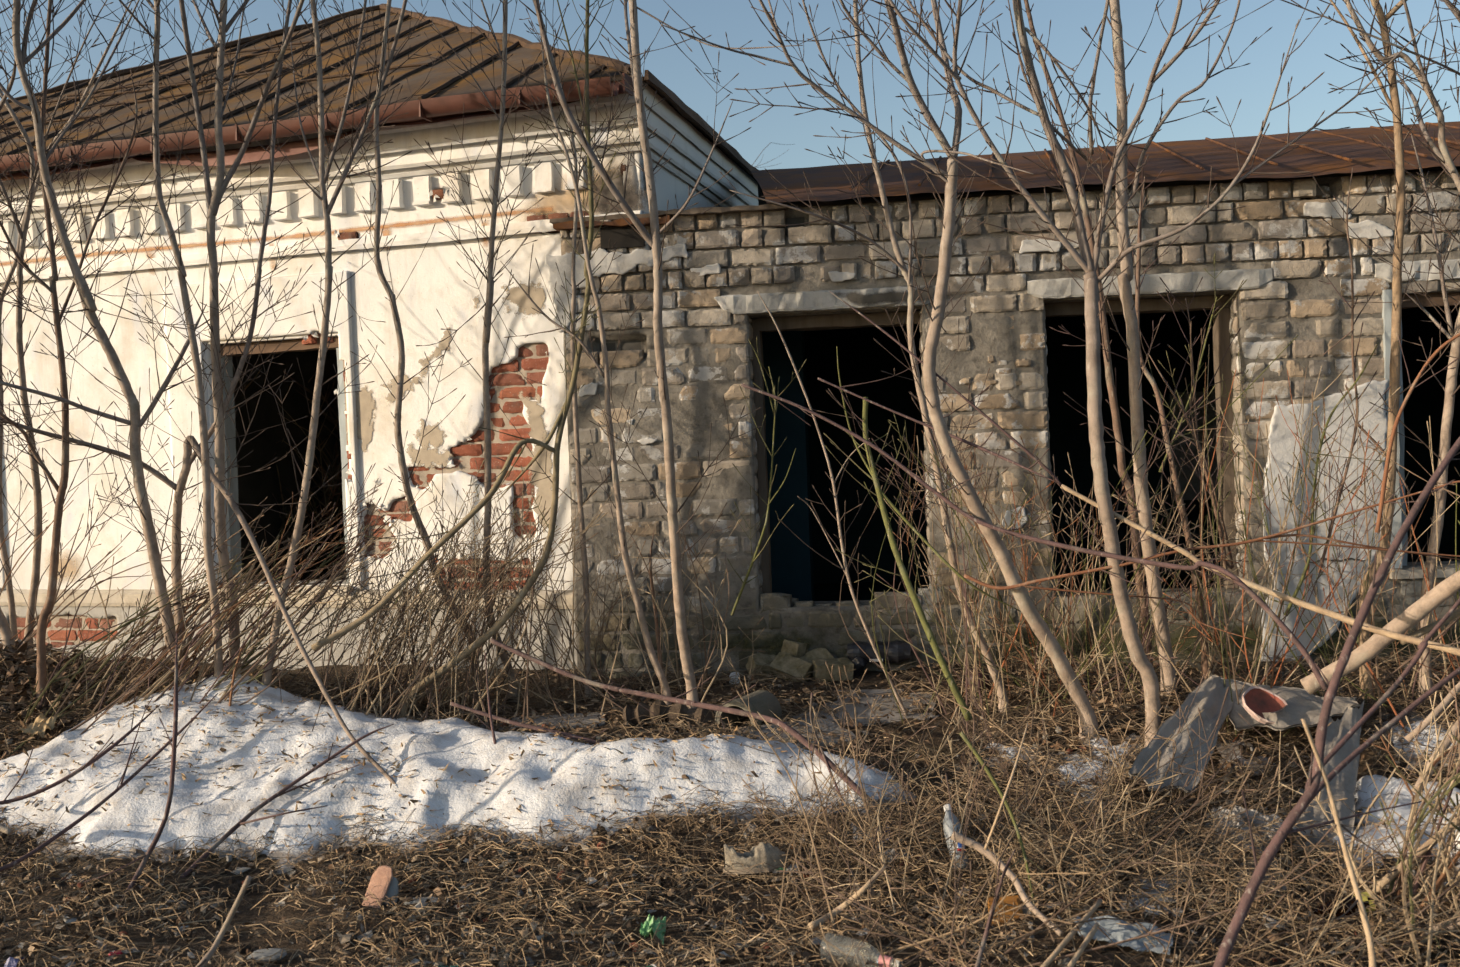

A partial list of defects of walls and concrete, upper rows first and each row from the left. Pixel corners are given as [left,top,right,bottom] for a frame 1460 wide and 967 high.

peeling [501,283,546,315]
spalling [302,331,334,345]
peeling [334,327,451,480]
spalling [361,343,553,560]
spalling [435,557,533,590]
spalling [9,614,118,649]